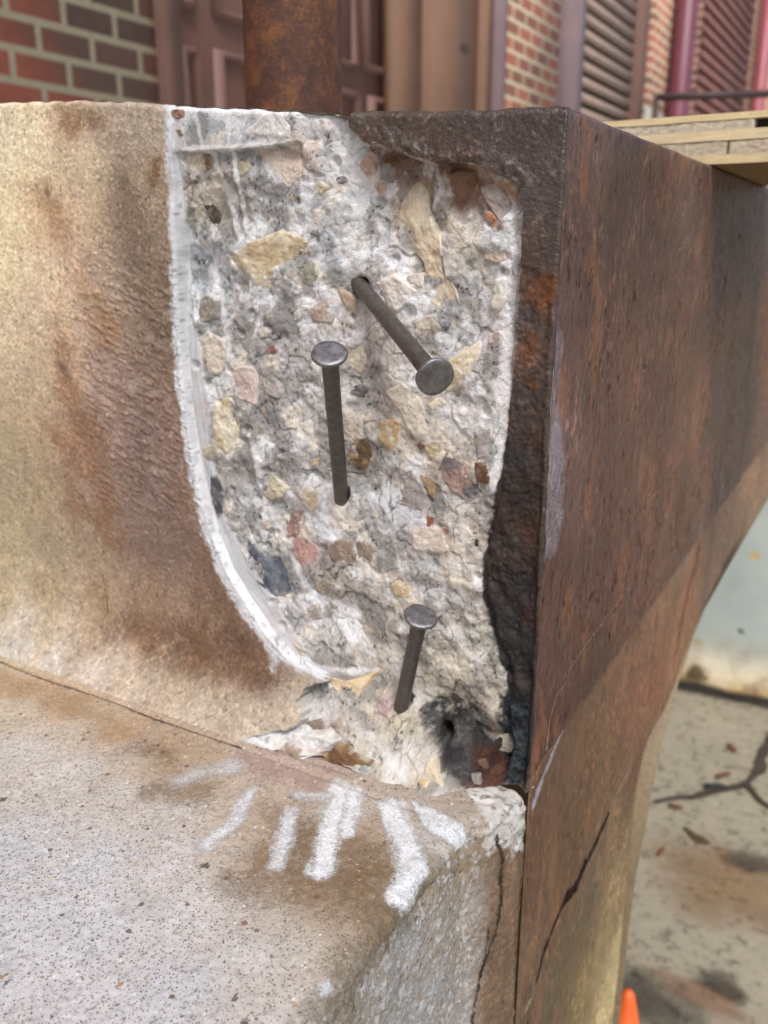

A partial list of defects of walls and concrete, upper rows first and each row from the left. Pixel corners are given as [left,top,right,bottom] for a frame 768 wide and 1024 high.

spalling [171,106,534,857]
corrosion [451,264,556,790]
water stain [420,692,529,785]
crack [471,835,504,1024]
crack [537,813,610,981]